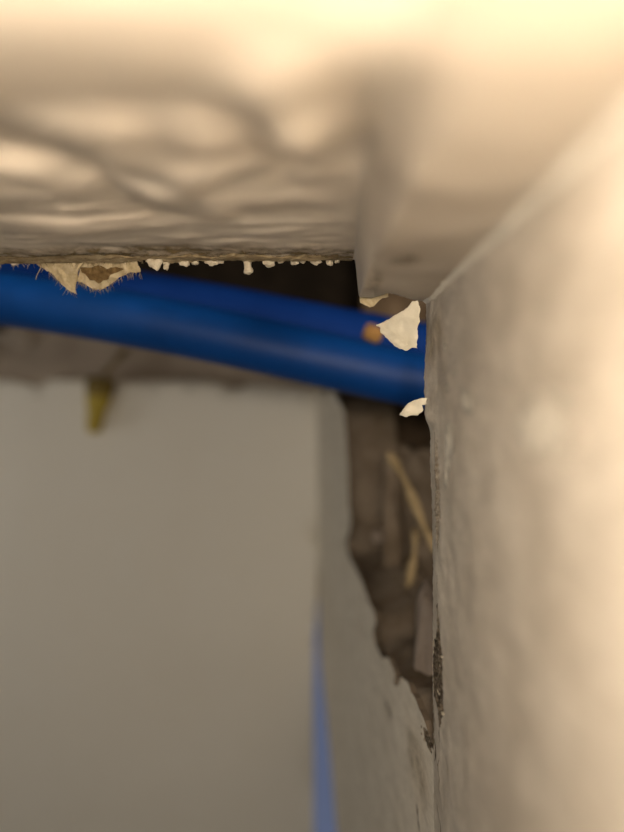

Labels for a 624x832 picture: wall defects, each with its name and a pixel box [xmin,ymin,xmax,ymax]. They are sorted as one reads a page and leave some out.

spalling [146,259,224,271]
spalling [262,260,340,268]
peeling [376,300,420,351]
spalling [321,388,445,743]